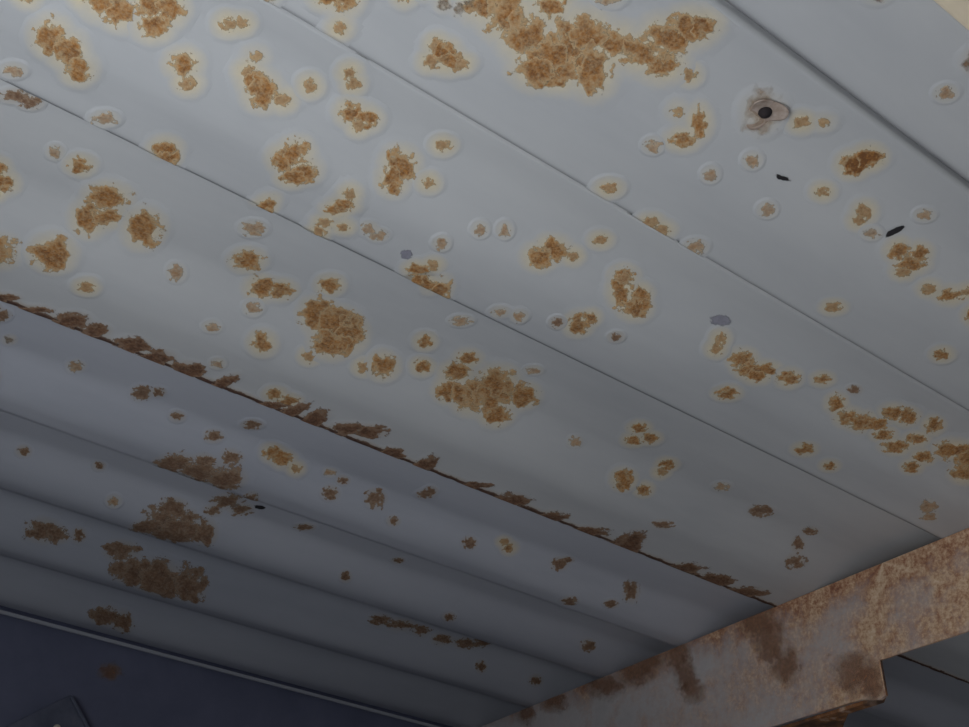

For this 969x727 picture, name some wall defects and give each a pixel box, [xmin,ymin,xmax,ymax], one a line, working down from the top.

corrosion [0,0,554,435]
corrosion [406,0,969,312]
corrosion [0,140,782,610]
corrosion [779,523,825,573]
corrosion [698,324,969,491]
corrosion [897,653,969,684]